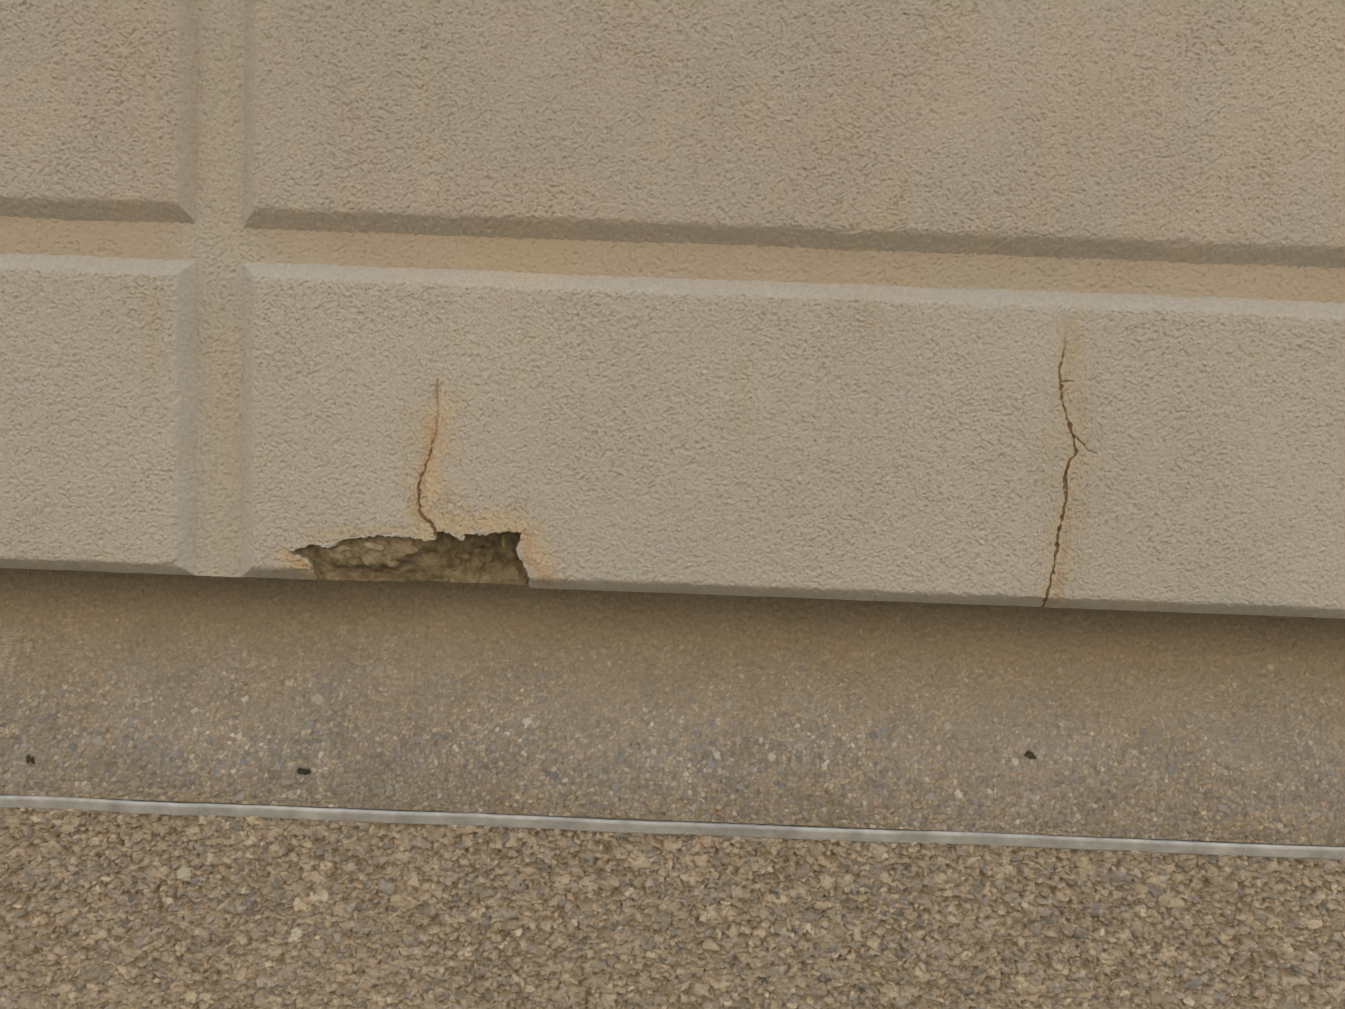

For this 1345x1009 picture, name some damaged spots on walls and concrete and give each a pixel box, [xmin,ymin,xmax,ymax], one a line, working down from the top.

crack [417,439,437,535]
crack [1041,353,1089,607]
spalling [291,531,530,586]